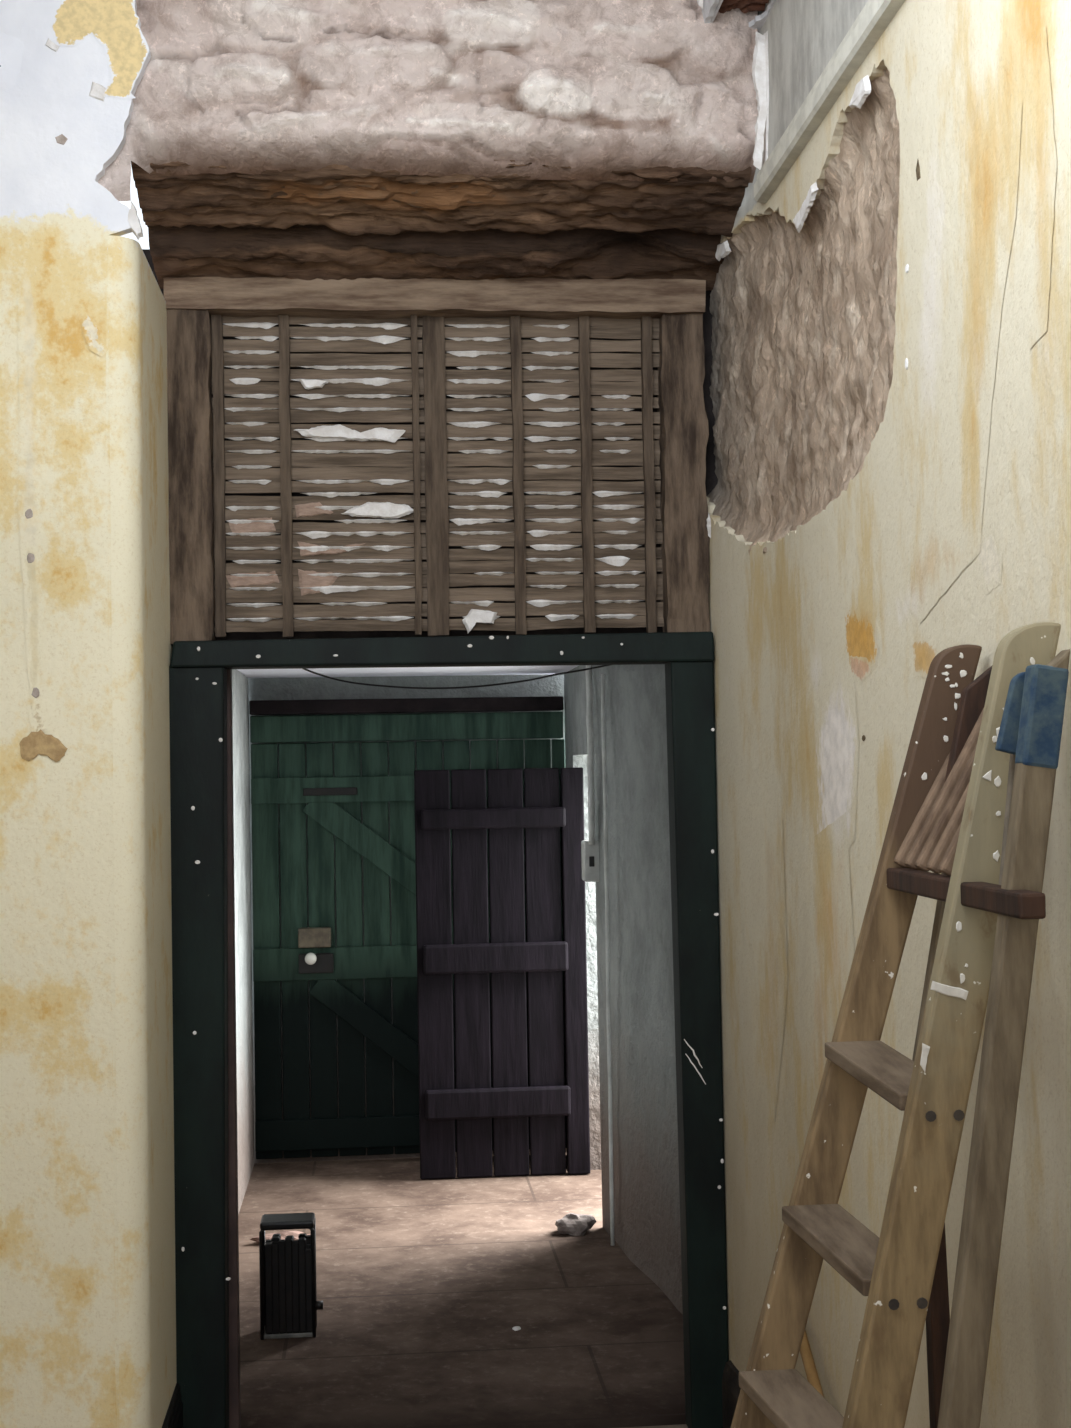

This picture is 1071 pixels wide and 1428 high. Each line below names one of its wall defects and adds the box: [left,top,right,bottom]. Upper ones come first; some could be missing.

spalling [45,0,769,240]